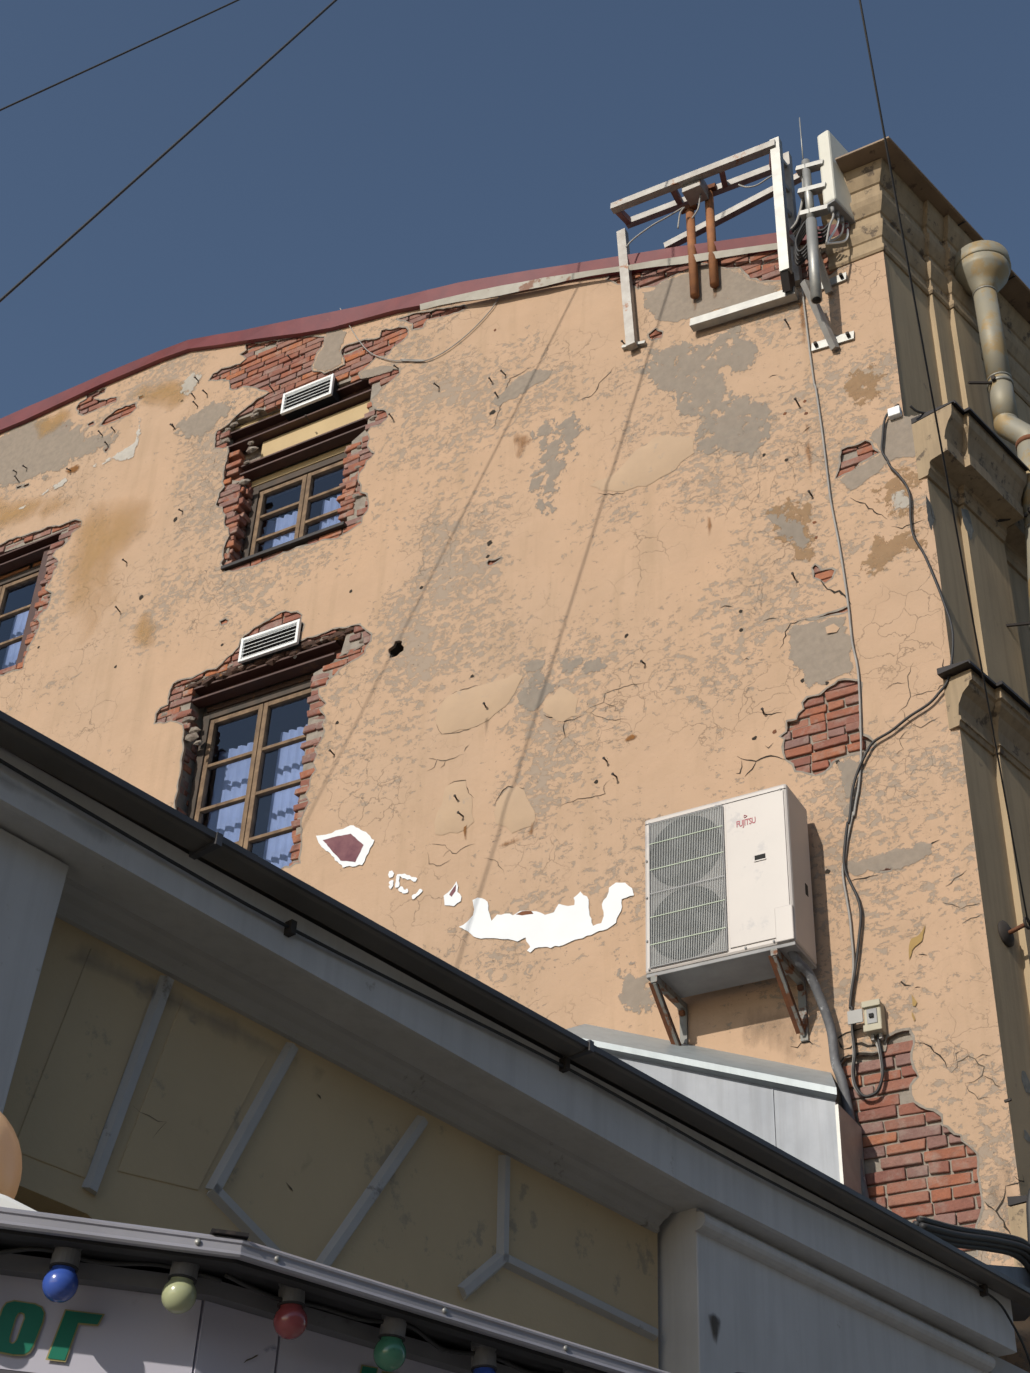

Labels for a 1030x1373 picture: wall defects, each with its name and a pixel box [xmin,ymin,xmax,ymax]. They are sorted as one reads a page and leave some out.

flaking render [647,327,664,341]
flaking render [208,304,467,572]
flaking render [834,440,880,480]
flaking render [0,519,82,676]
spalling [390,642,404,657]
flaking render [154,610,372,869]
flaking render [778,678,877,776]
flaking render [835,996,984,1229]
crack [984,1176,1024,1234]